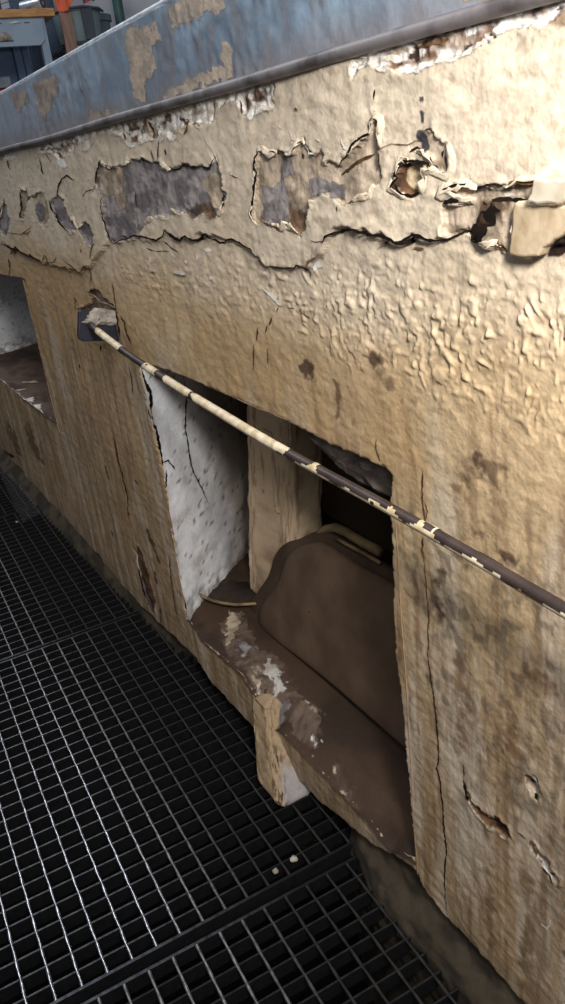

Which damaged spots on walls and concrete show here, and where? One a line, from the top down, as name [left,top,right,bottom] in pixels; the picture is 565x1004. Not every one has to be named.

spalling [349,0,565,75]
spalling [0,174,94,246]
spalling [38,41,276,244]
spalling [248,110,565,256]
crack [4,227,474,369]
crack [104,437,139,536]
crack [129,368,209,504]
crack [168,558,176,610]
spalling [215,611,259,658]
spalling [251,658,291,729]
crack [421,472,448,916]
hole [463,766,564,888]